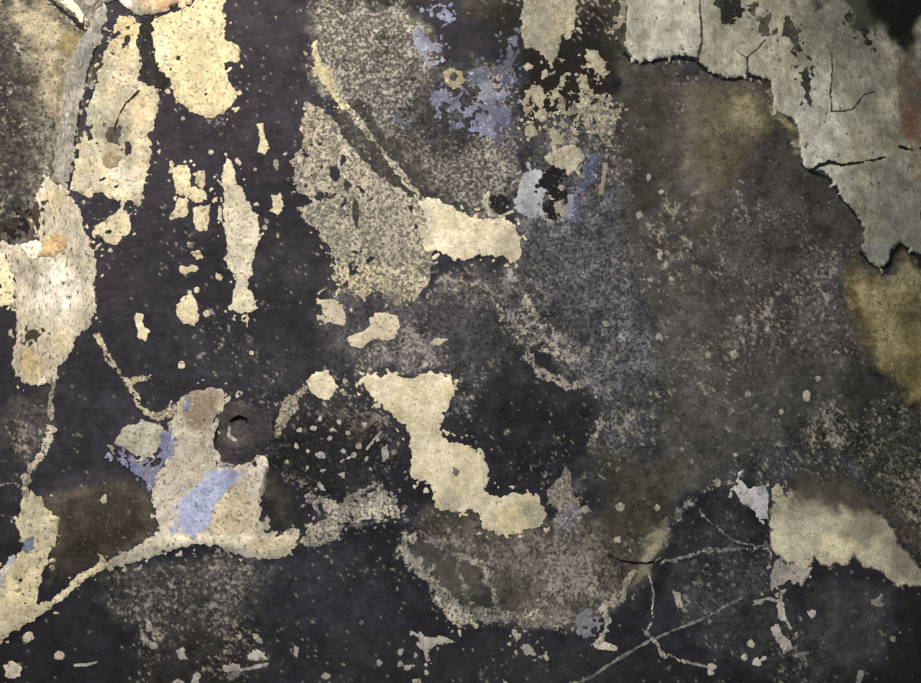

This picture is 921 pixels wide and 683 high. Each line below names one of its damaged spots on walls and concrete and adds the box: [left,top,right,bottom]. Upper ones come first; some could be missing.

peeling [0,0,527,396]
peeling [489,0,629,229]
crack [622,0,765,81]
spalling [607,0,921,276]
crack [829,52,875,112]
crack [800,145,921,224]
leakage [844,252,921,405]
crack [859,243,921,270]
peeling [0,380,304,644]
peeling [274,363,591,543]
crack [595,509,772,668]
peeling [753,480,921,666]